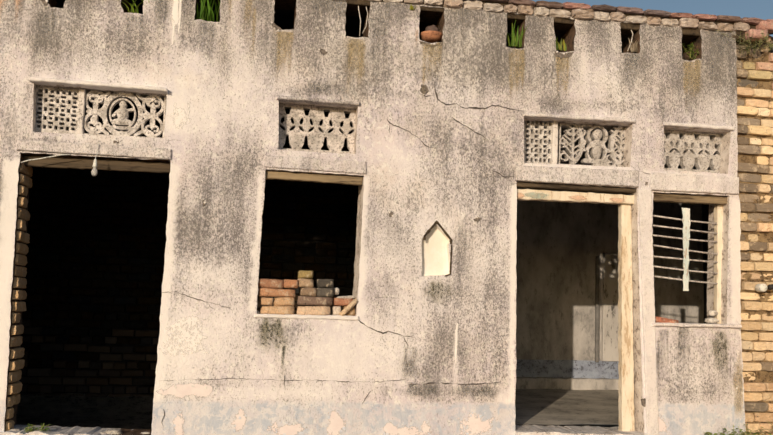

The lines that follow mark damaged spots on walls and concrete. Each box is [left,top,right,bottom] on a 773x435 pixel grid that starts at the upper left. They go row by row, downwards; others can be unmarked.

leakage [349,3,408,69]
crack [421,82,522,140]
leakage [258,318,286,367]
crack [359,320,411,345]
peeling [383,421,432,435]
peeling [459,412,498,435]